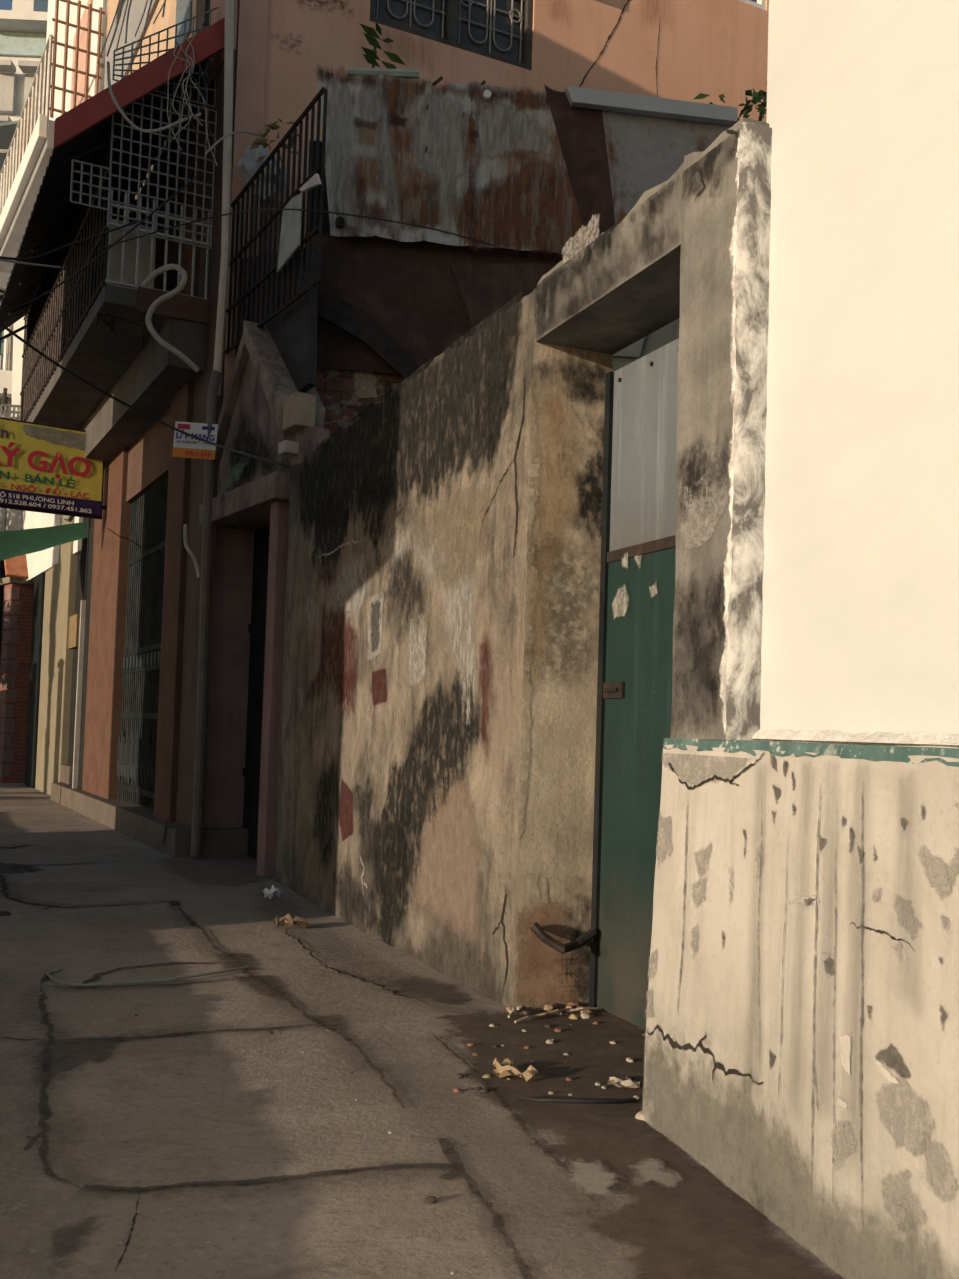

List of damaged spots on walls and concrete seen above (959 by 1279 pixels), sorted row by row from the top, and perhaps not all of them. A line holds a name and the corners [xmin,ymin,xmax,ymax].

crack [579,0,630,87]
rust [317,68,586,255]
damp [295,132,739,567]
crack [480,373,525,558]
damp [334,674,502,1004]
peeling [656,815,673,860]
peeling [770,752,795,821]
peeling [842,816,877,862]
crack [0,844,535,1279]
crack [644,753,914,1218]
damp [643,1040,942,1279]
peeling [876,1044,958,1201]